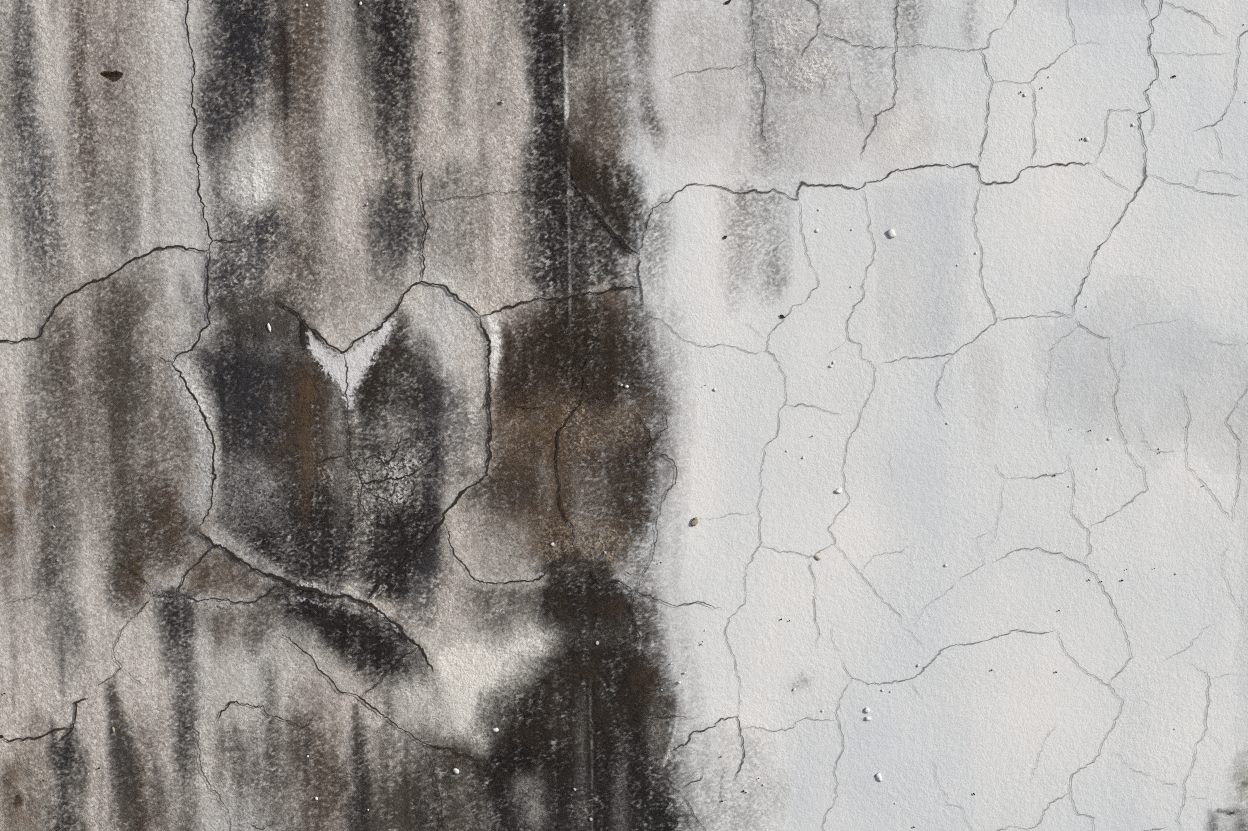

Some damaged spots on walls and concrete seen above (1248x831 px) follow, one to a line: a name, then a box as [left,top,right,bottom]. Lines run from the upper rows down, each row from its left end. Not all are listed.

water stain [13,0,47,270]
crack [716,0,899,152]
crack [641,46,1089,248]
crack [896,0,1246,360]
crack [0,0,644,831]
water stain [35,0,684,831]
crack [589,409,781,831]
crack [1006,545,1133,684]